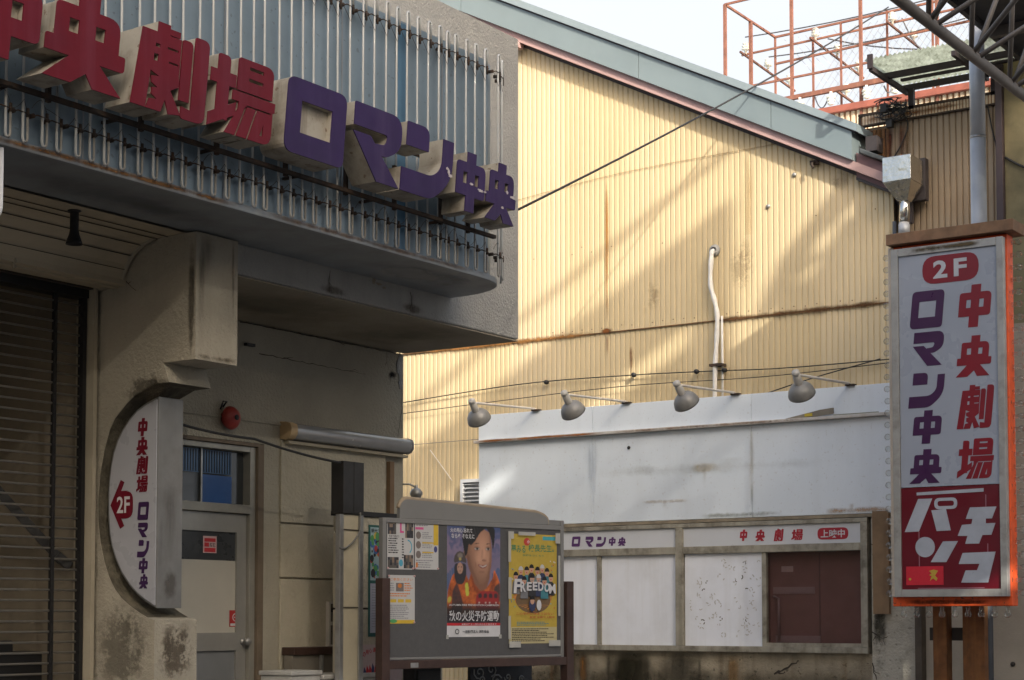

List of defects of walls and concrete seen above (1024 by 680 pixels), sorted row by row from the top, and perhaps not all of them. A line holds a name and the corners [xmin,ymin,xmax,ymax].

corrosion [723,302,874,321]
crack [240,322,402,374]
peeling [695,561,757,637]